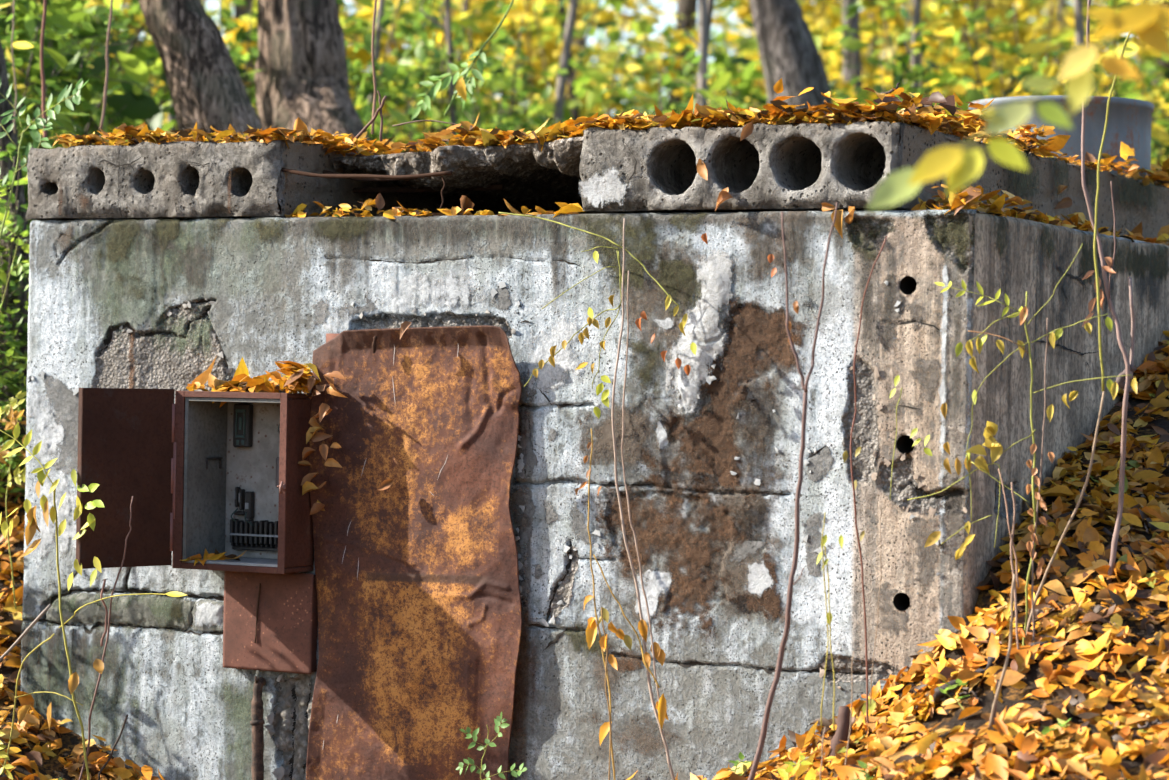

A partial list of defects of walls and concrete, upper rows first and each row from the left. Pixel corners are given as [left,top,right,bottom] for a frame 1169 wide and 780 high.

leakage [860,248,903,346]
leakage [1000,220,1073,375]
leakage [1093,240,1116,319]
leakage [1135,248,1168,310]
spalling [26,298,232,481]
rust [517,408,527,456]
leakage [929,262,973,490]
rust [509,481,530,532]
leakage [938,467,946,544]
rust [511,596,535,738]
crack [529,624,573,651]
spalling [264,672,315,780]